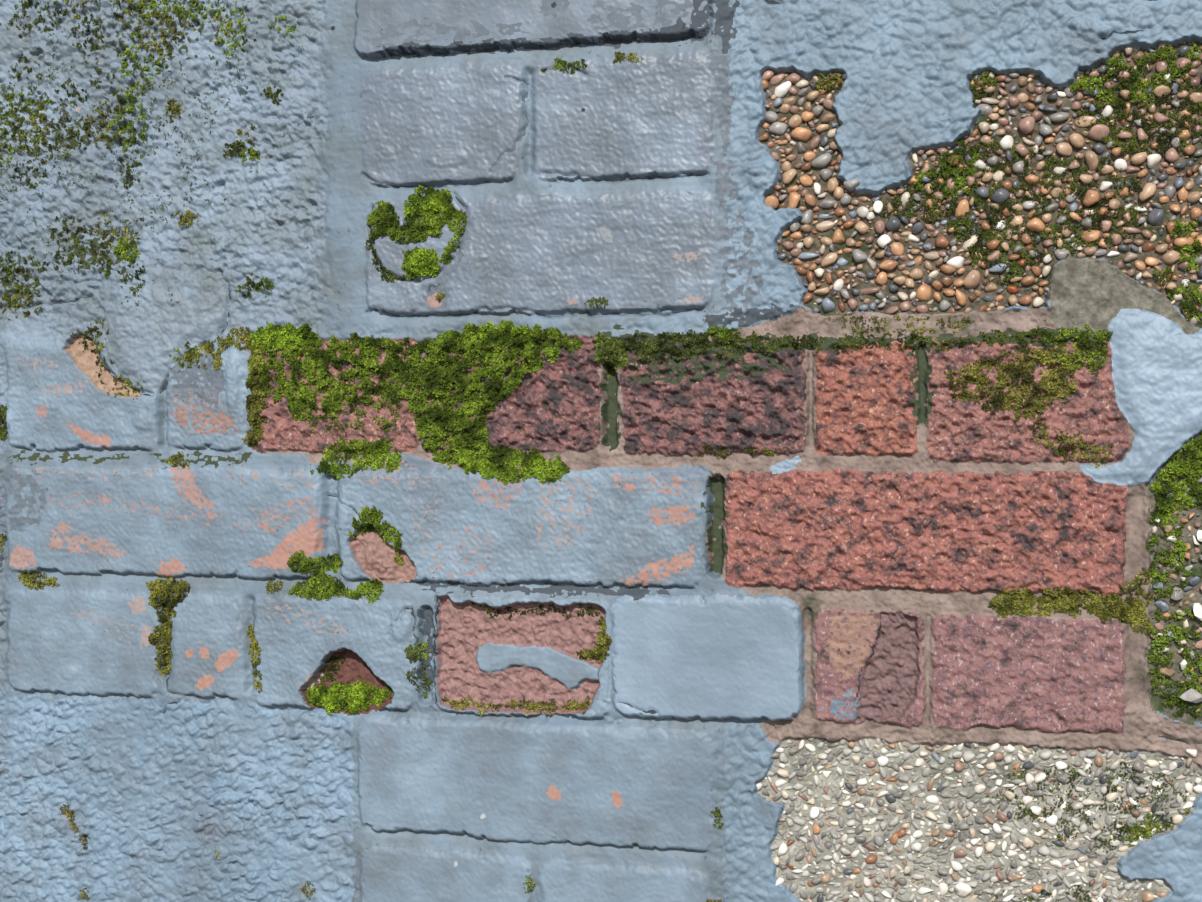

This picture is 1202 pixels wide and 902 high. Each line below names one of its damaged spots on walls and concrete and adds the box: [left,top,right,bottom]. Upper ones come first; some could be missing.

peeling [15,306,1136,587]
peeling [69,593,156,649]
peeling [185,647,238,691]
spalling [263,601,394,716]
spalling [435,595,608,714]
peeling [743,483,1202,769]